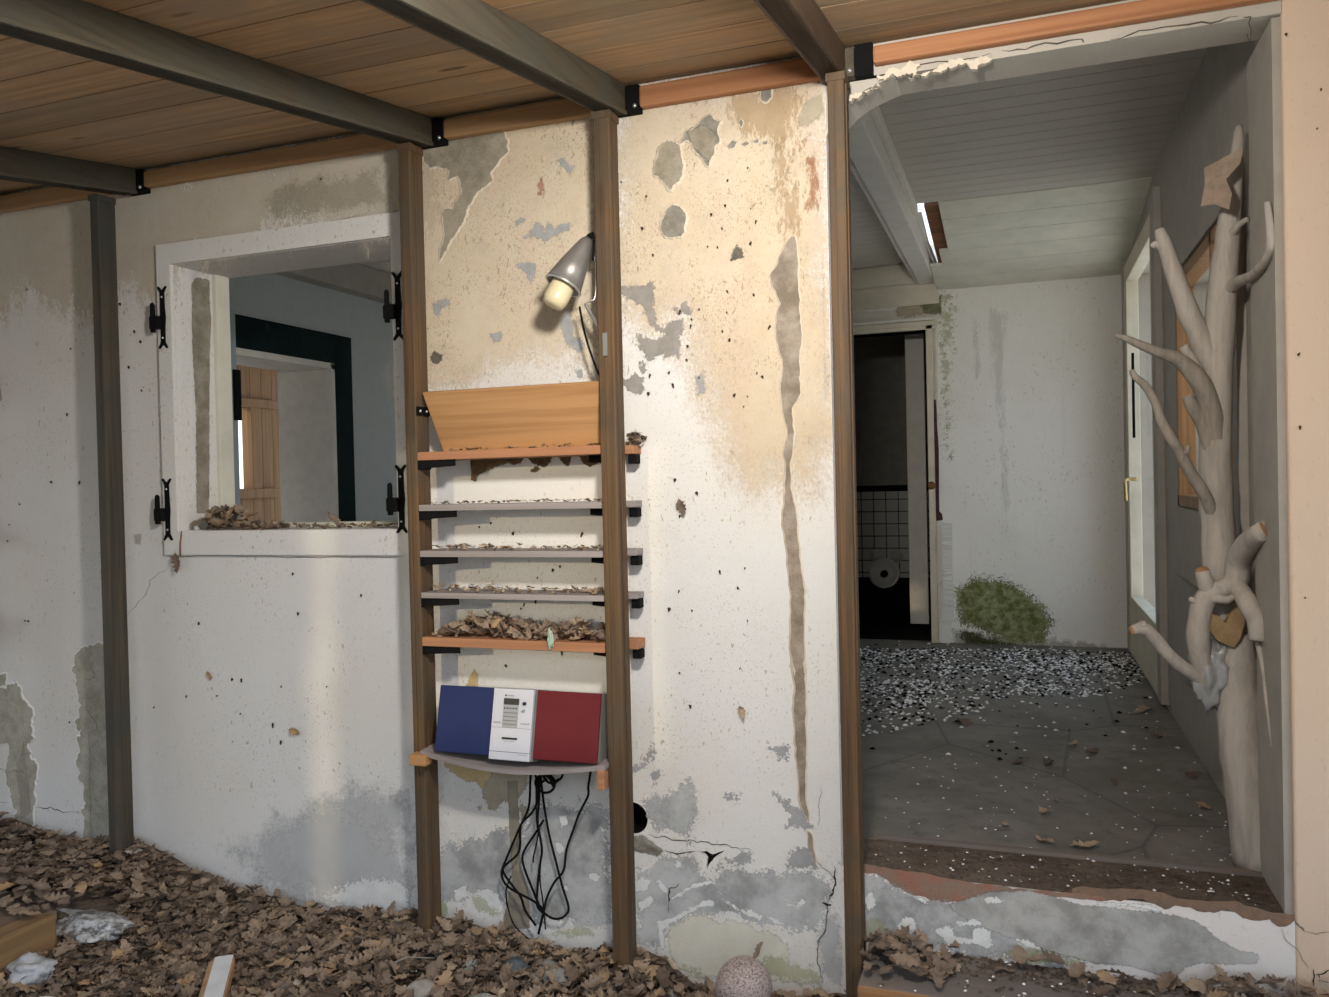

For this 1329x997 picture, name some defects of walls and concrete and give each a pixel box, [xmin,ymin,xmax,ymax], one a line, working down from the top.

spalling [848,56,992,104]
spalling [422,131,510,264]
spalling [652,113,769,240]
peeling [621,282,693,395]
damp [618,81,832,491]
spalling [0,672,39,826]
spalling [71,640,109,839]
damp [320,873,412,913]
crack [649,834,751,909]
peeling [864,863,1295,975]
crack [1283,920,1329,986]